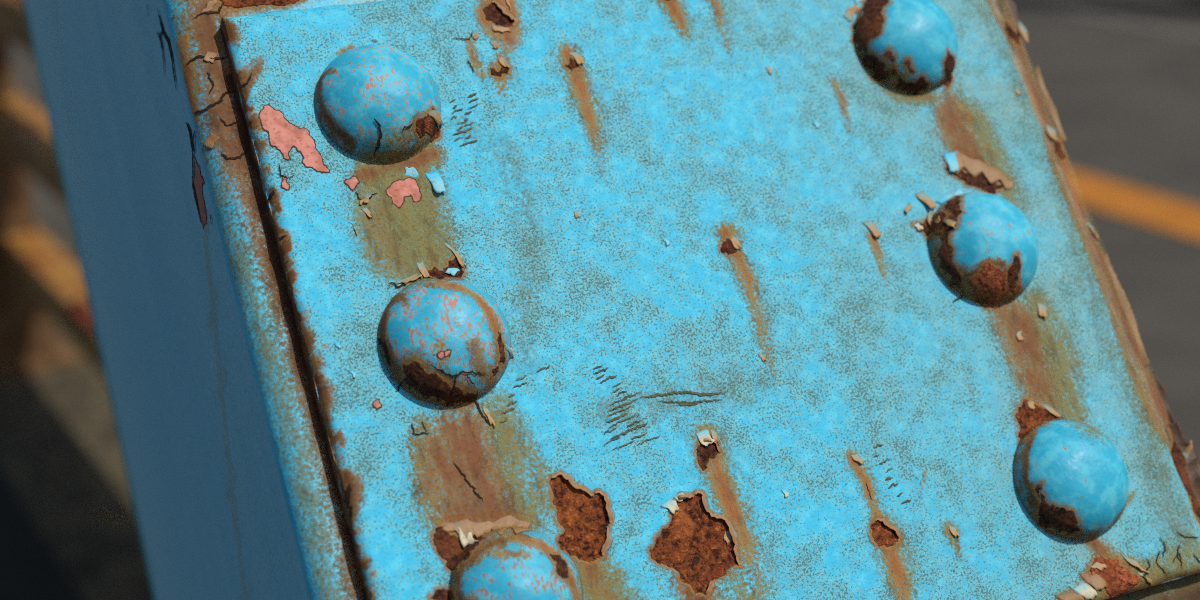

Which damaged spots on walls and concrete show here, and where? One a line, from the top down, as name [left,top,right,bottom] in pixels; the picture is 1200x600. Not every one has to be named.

crack [147,10,248,227]
crack [195,0,225,18]
peeling [258,104,331,190]
peeling [344,167,446,219]
corrosion [452,0,523,95]
corrosion [559,43,605,162]
corrosion [657,0,693,40]
corrosion [176,0,372,600]
corrosion [315,68,644,600]
corrosion [716,224,773,370]
corrosion [843,0,1200,600]
corrosion [647,423,768,600]